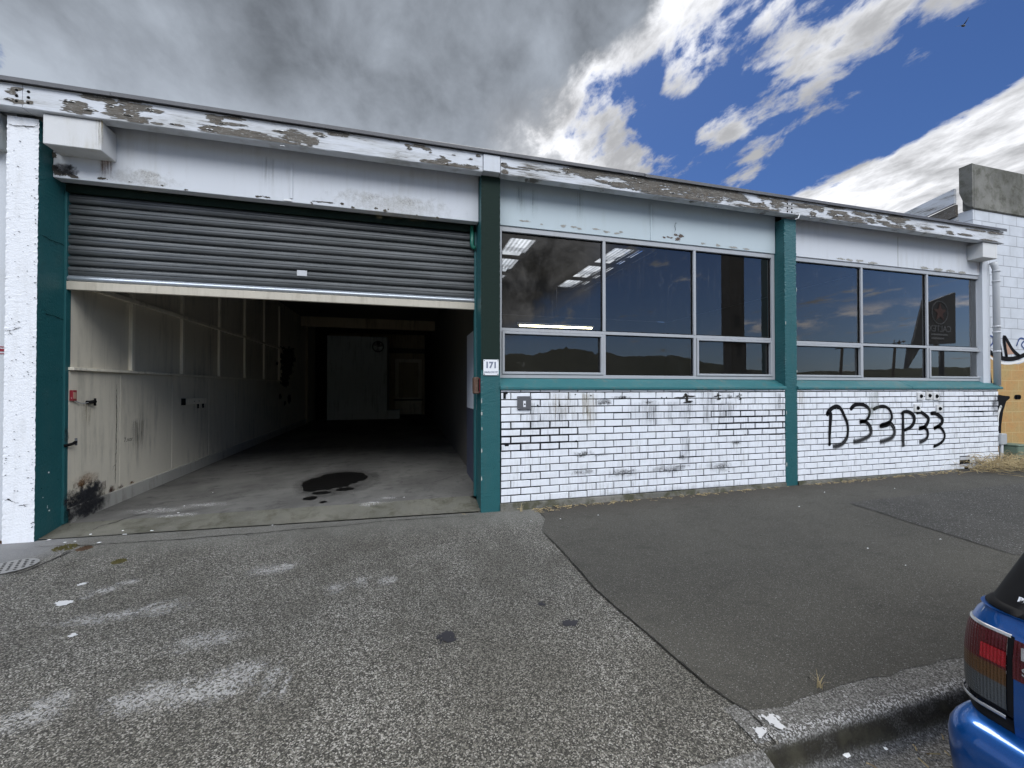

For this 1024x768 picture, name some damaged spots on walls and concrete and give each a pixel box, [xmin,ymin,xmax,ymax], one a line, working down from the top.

peeling [59,94,185,127]
peeling [198,114,349,147]
peeling [500,162,1004,242]